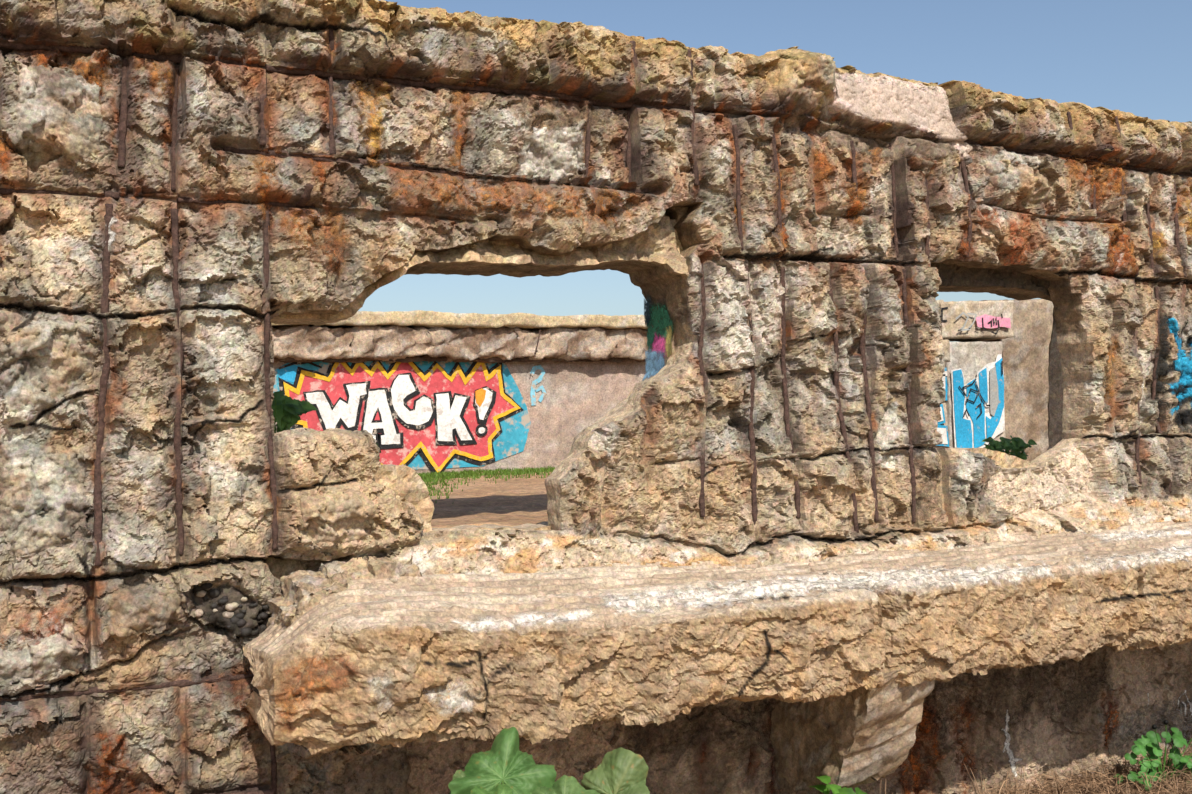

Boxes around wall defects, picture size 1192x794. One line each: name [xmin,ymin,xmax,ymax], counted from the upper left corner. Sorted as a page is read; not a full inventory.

rust [74,54,108,96]
rust [396,86,631,224]
flaking render [816,79,1191,332]
rust [1058,156,1125,207]
rust [1092,221,1137,272]
spalling [724,125,869,453]
crack [10,391,92,430]
spalling [833,311,916,522]
spalling [749,367,758,525]
crack [0,553,281,584]
spalling [192,583,272,637]
crack [5,670,88,702]